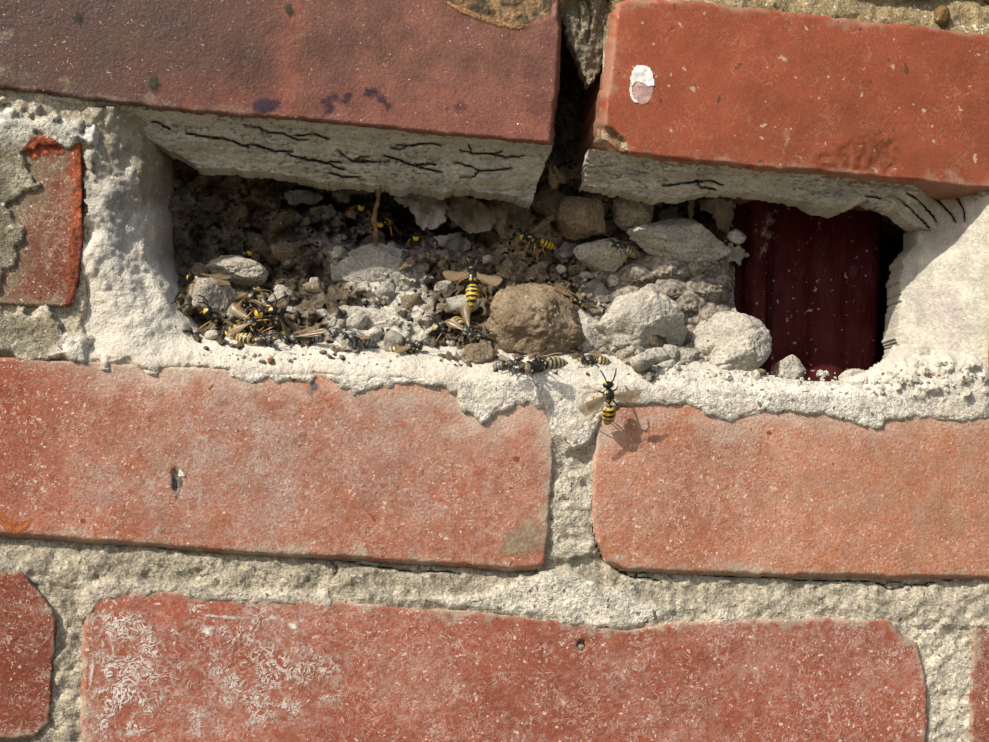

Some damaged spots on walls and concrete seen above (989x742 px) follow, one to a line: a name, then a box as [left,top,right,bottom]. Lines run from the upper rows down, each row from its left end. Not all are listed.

spalling [444,0,555,29]
peeling [0,106,13,132]
spalling [22,135,64,159]
crack [152,121,523,178]
spalling [592,125,630,155]
crack [664,179,723,190]
spalling [54,114,100,307]